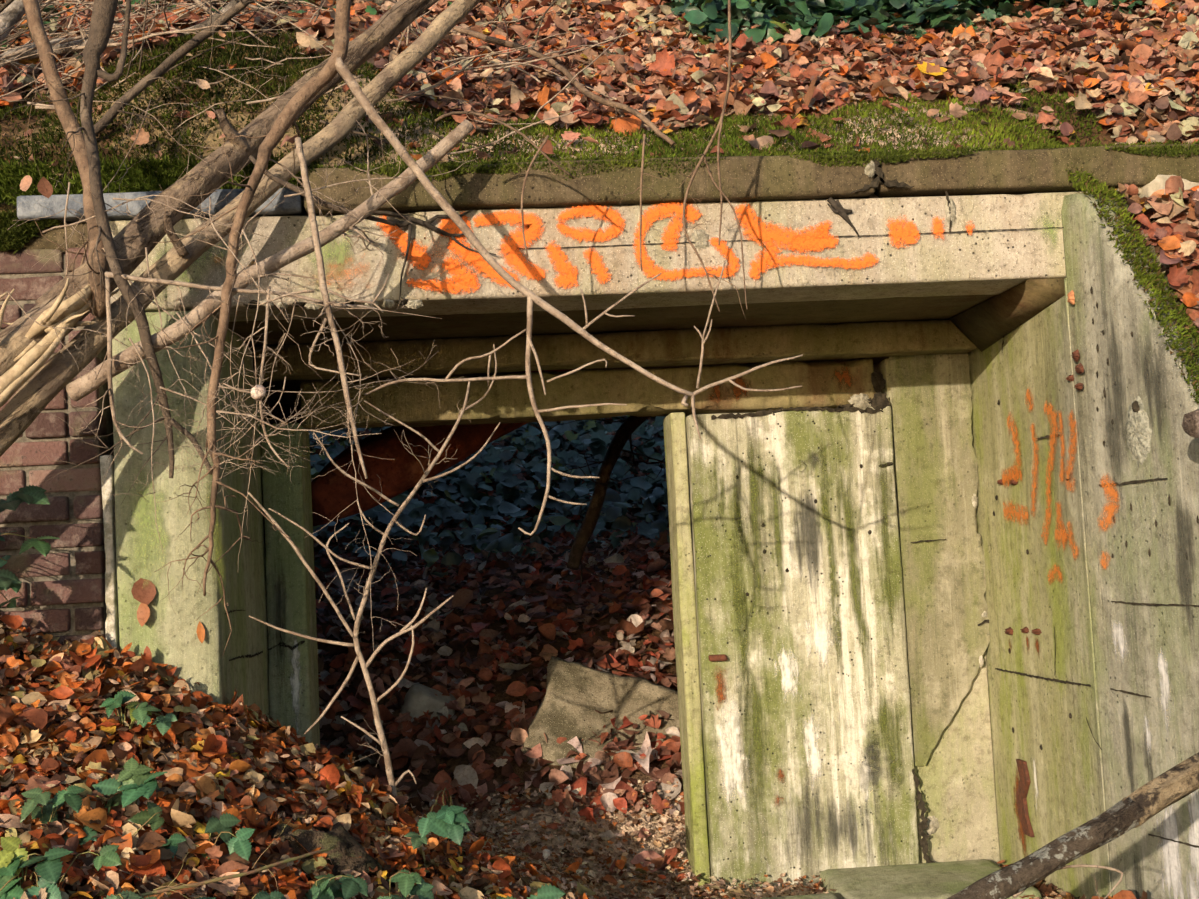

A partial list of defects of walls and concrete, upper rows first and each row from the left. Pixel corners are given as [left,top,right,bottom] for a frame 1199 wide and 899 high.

leakage [136,489,167,559]
leakage [876,474,893,624]
leakage [275,574,300,712]
rust [716,672,726,703]
leakage [714,447,869,806]
rust [1004,626,1042,654]
leakage [797,701,904,855]
rust [1014,772,1026,858]